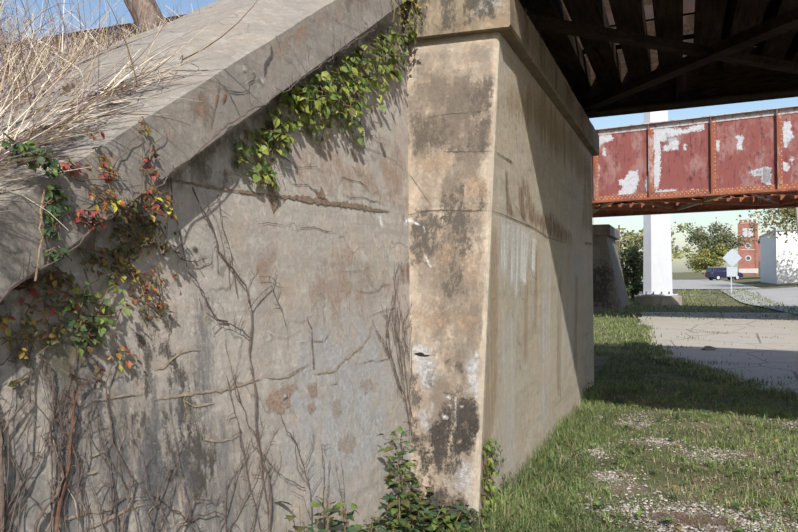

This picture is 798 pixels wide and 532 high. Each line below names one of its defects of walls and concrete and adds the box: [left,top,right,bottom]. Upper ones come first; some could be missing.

crack [164,151,389,233]
crack [331,133,565,243]
peeling [598,134,613,169]
peeling [618,124,705,195]
peeling [748,166,772,185]
peeling [782,121,795,172]
damp [405,185,476,296]
damp [501,224,536,295]
damp [410,348,433,409]
damp [132,315,237,532]
damp [411,359,479,527]